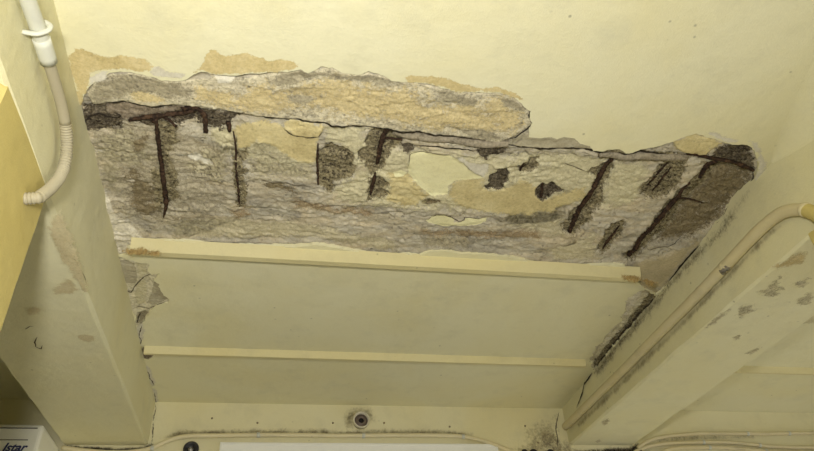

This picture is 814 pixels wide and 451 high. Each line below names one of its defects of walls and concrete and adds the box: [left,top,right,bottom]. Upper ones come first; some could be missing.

rust [82,103,243,212]
rust [226,146,254,219]
rust [290,128,415,219]
spalling [69,48,767,369]
rust [474,147,506,160]
rust [560,149,624,237]
rust [597,219,625,254]
rust [623,145,756,261]
crack [137,324,159,438]